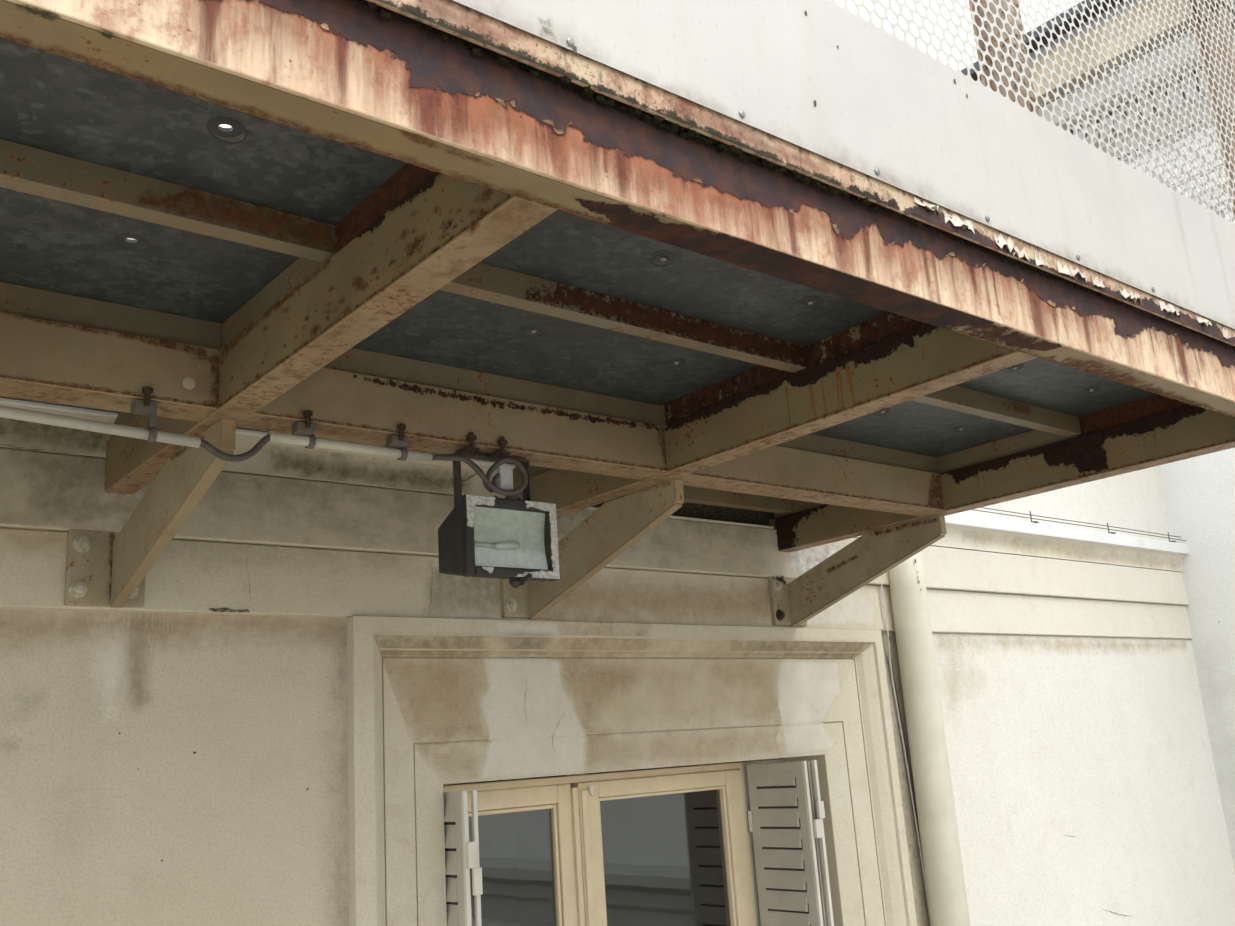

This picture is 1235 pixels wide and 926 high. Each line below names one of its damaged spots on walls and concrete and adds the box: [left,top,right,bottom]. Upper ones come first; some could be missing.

corrosion [0,0,1235,551]
peeling [847,185,1235,344]
leakage [412,655,590,781]
leakage [775,658,843,756]